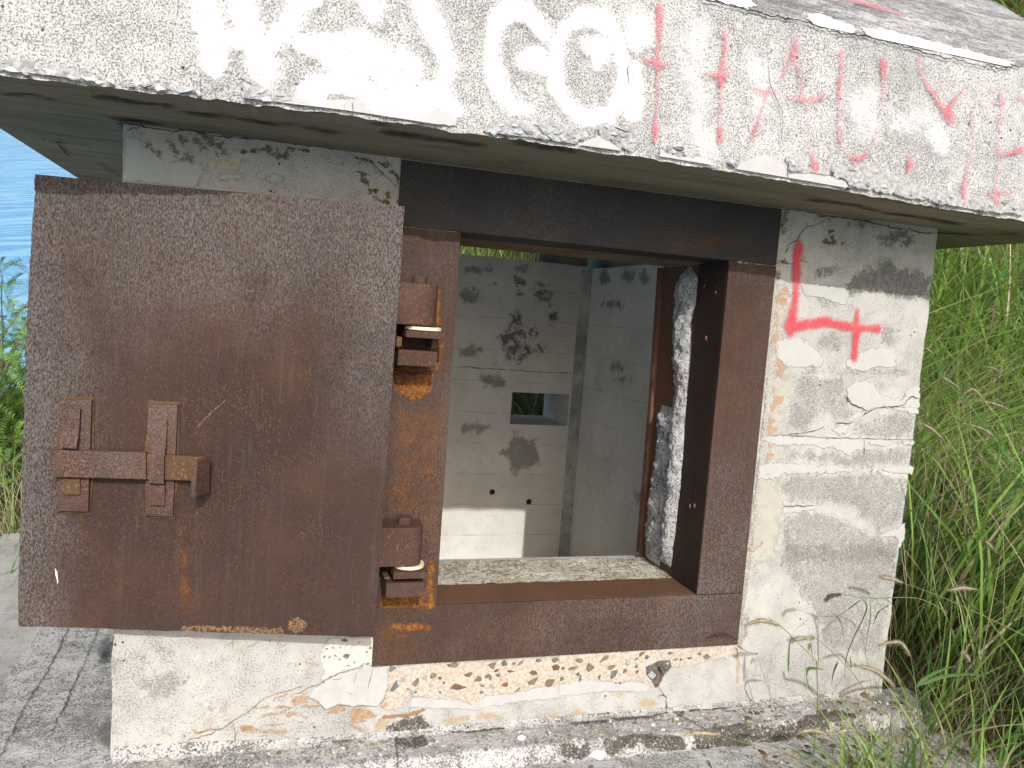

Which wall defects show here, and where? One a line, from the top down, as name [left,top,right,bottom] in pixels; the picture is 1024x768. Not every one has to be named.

water stain [357,161,400,205]
water stain [846,261,931,301]
corrosion [394,342,443,401]
water stain [497,314,543,364]
corrosion [765,287,789,462]
spalling [644,266,698,567]
spalling [381,375,796,711]
corrosion [380,564,435,609]
crack [0,628,68,757]
crack [51,628,98,734]
crack [180,664,385,744]
spalling [319,638,373,683]